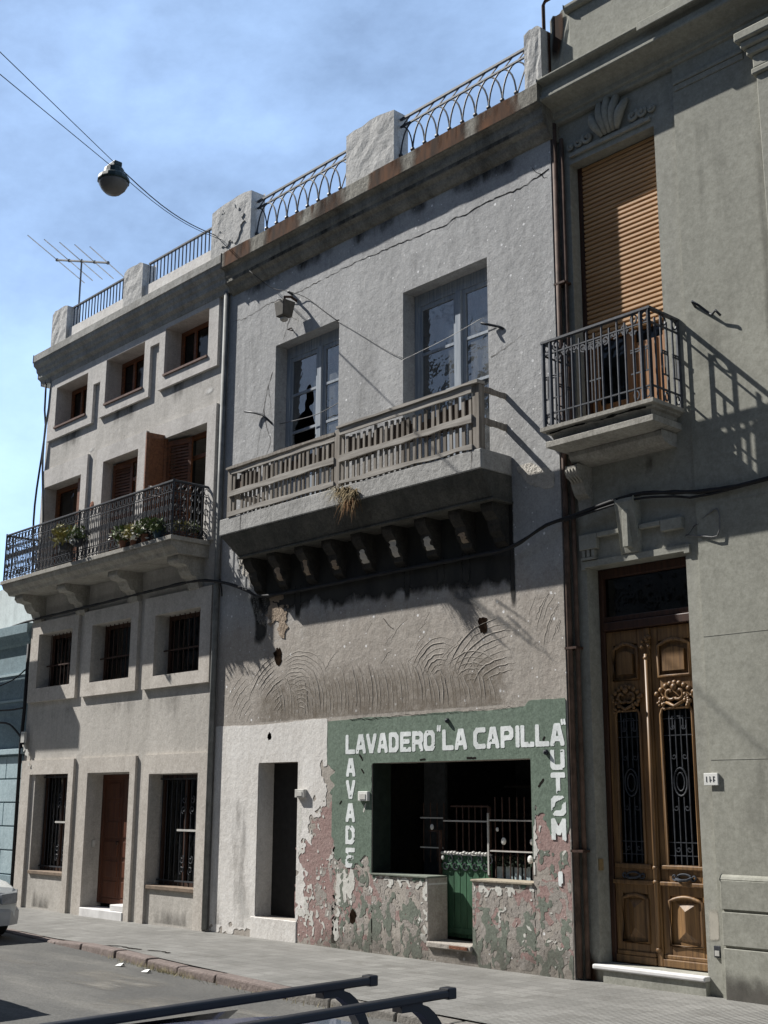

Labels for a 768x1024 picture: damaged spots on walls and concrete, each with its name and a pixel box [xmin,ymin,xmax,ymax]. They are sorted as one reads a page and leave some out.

corrosion [414,94,516,166]
corrosion [368,157,401,190]
corrosion [224,238,250,266]
corrosion [264,191,340,245]
crack [236,168,549,336]
spalling [266,595,289,638]
peeling [294,800,429,959]
peeling [472,806,574,979]